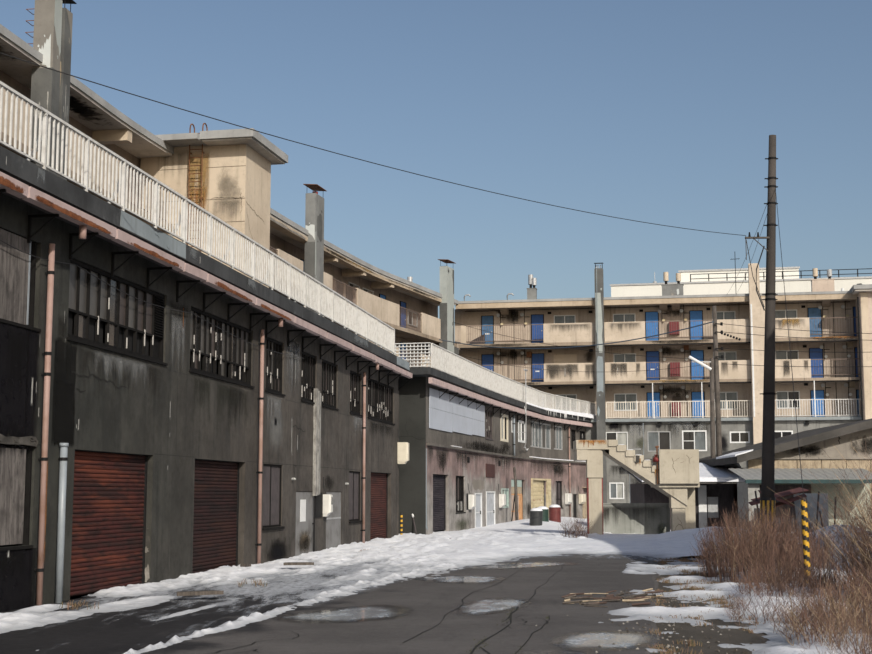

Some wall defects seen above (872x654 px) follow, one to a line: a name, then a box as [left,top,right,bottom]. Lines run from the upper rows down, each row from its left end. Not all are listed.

rust [188,156,209,214]
rust [36,196,111,234]